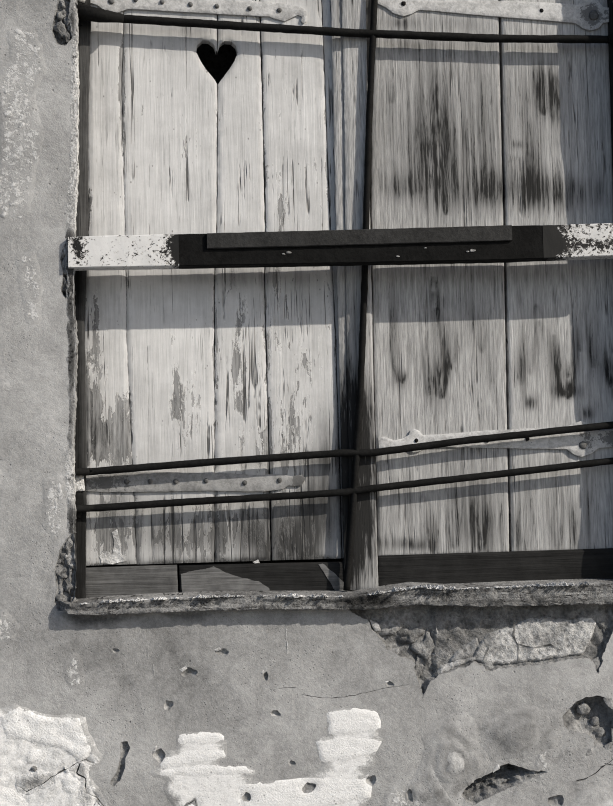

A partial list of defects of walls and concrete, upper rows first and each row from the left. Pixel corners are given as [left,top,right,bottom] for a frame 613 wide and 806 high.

flaking render [348,604,613,698]
peeling [0,707,101,806]
flaking render [563,695,613,756]